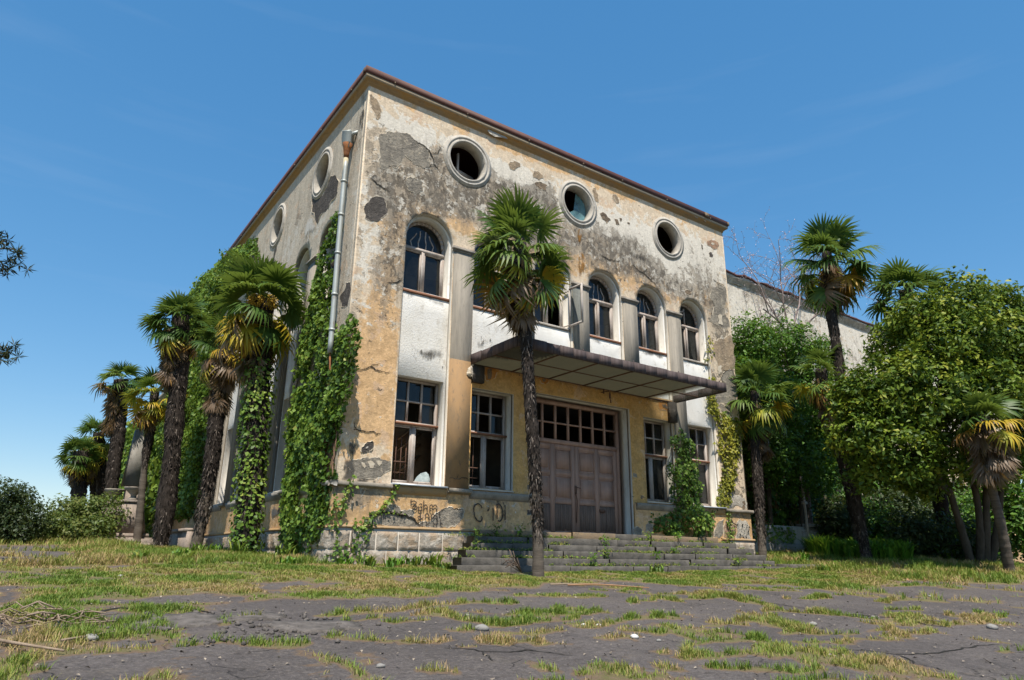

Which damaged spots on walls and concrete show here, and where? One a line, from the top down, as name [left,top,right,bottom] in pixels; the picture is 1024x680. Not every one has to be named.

flaking render [378,131,431,194]
flaking render [533,171,547,190]
flaking render [311,175,339,224]
flaking render [593,188,630,225]
flaking render [701,240,719,257]
flaking render [340,282,351,308]
flaking render [348,441,391,480]